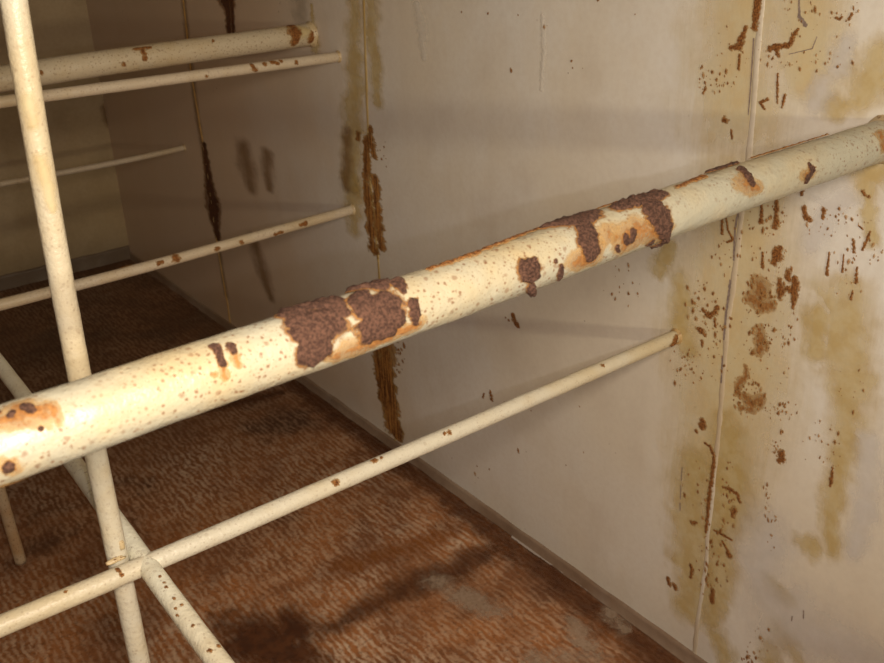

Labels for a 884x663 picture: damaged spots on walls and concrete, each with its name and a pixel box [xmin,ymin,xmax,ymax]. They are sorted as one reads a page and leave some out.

rust [208,276,423,464]
water stain [344,0,381,234]
rust [355,124,387,259]
water stain [672,198,781,663]
rust [699,0,762,95]
rust [684,199,800,420]
water stain [706,0,829,138]
rust [758,1,854,110]
water stain [796,282,873,556]
rust [800,162,883,301]
water stain [857,164,884,245]
rust [331,462,676,663]